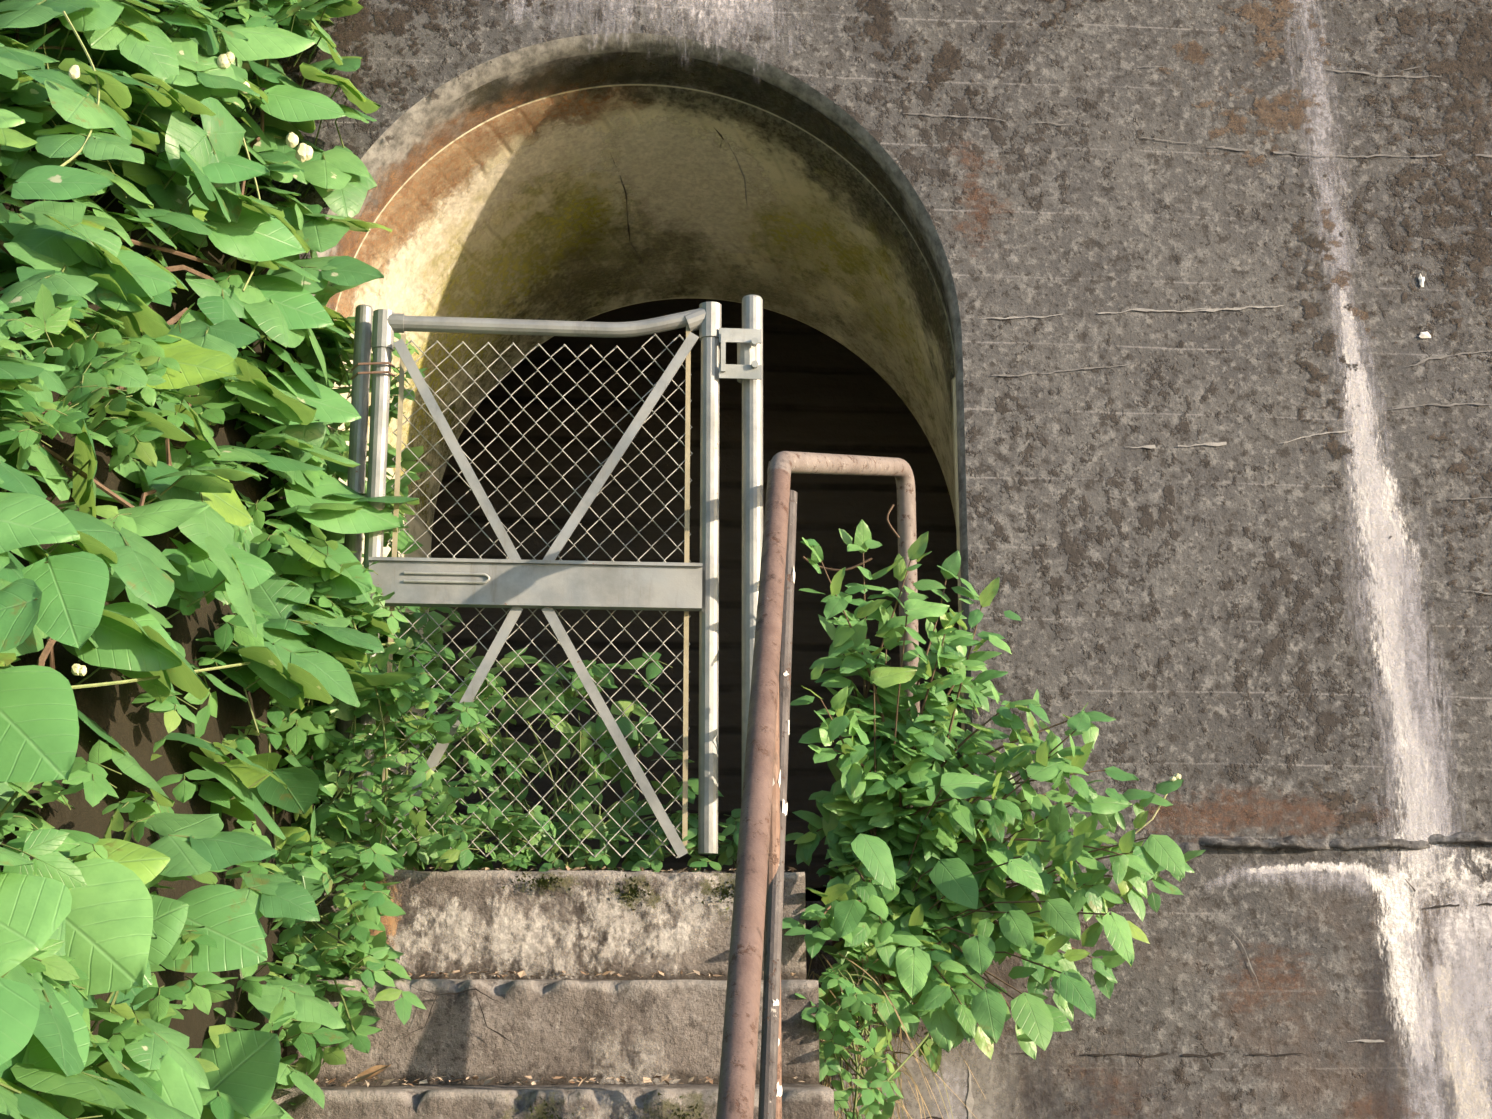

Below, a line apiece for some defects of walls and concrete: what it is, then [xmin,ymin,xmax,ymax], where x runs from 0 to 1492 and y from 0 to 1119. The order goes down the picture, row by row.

damp [392,186,617,528]
damp [1218,0,1492,1119]
crack [923,1064,974,1119]